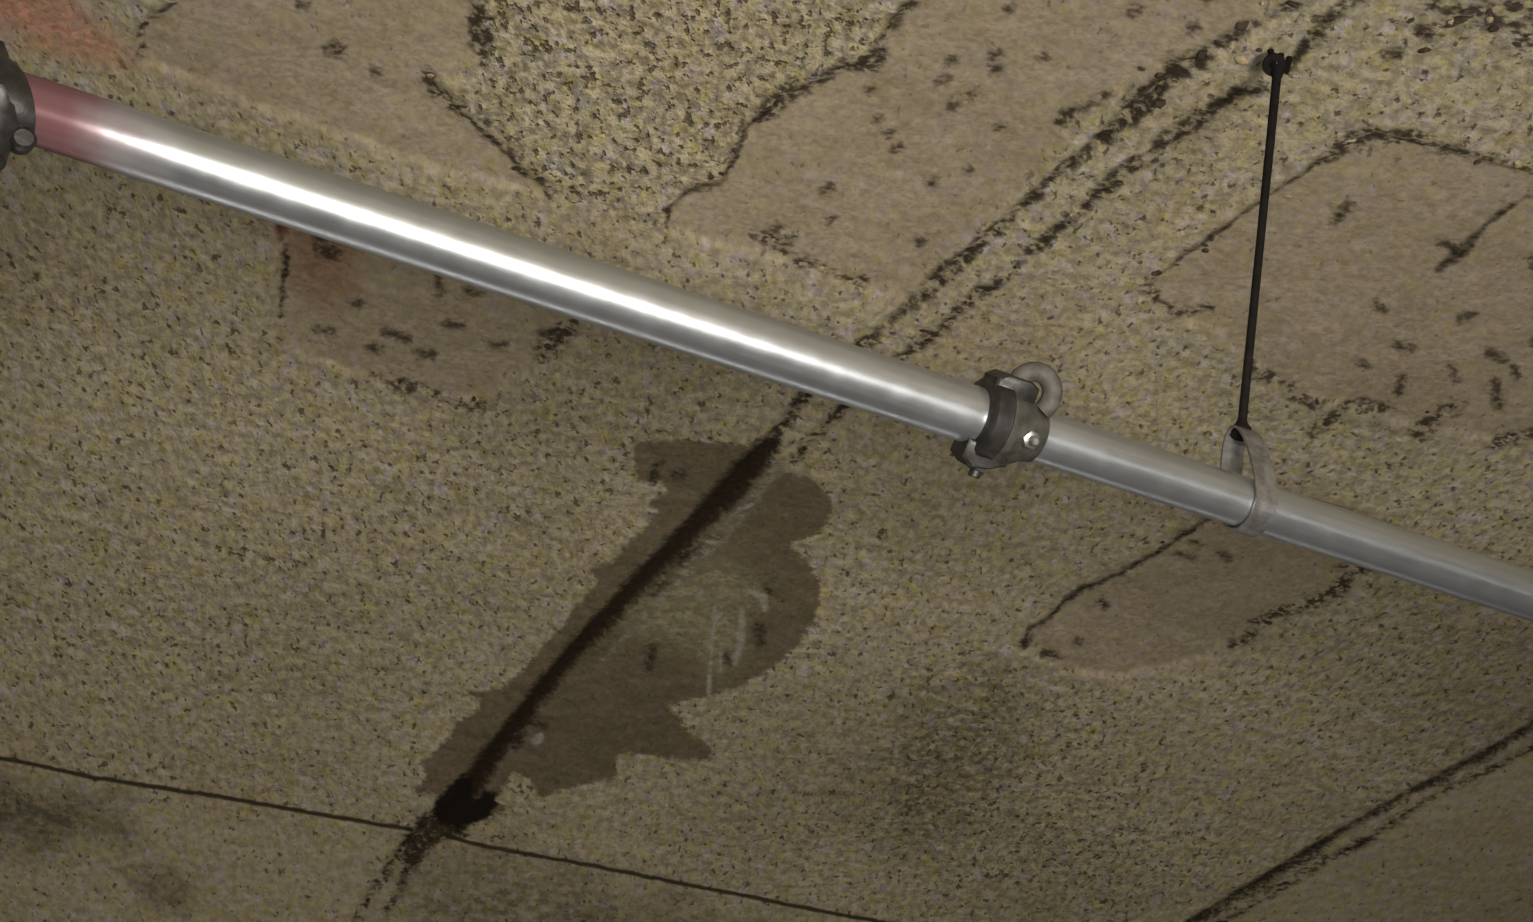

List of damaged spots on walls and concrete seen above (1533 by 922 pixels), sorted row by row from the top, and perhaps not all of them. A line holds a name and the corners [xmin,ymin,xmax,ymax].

crack [856,0,1362,356]
crack [1436,196,1528,272]
crack [0,392,885,922]
leakage [416,441,831,822]
crack [1187,723,1533,922]